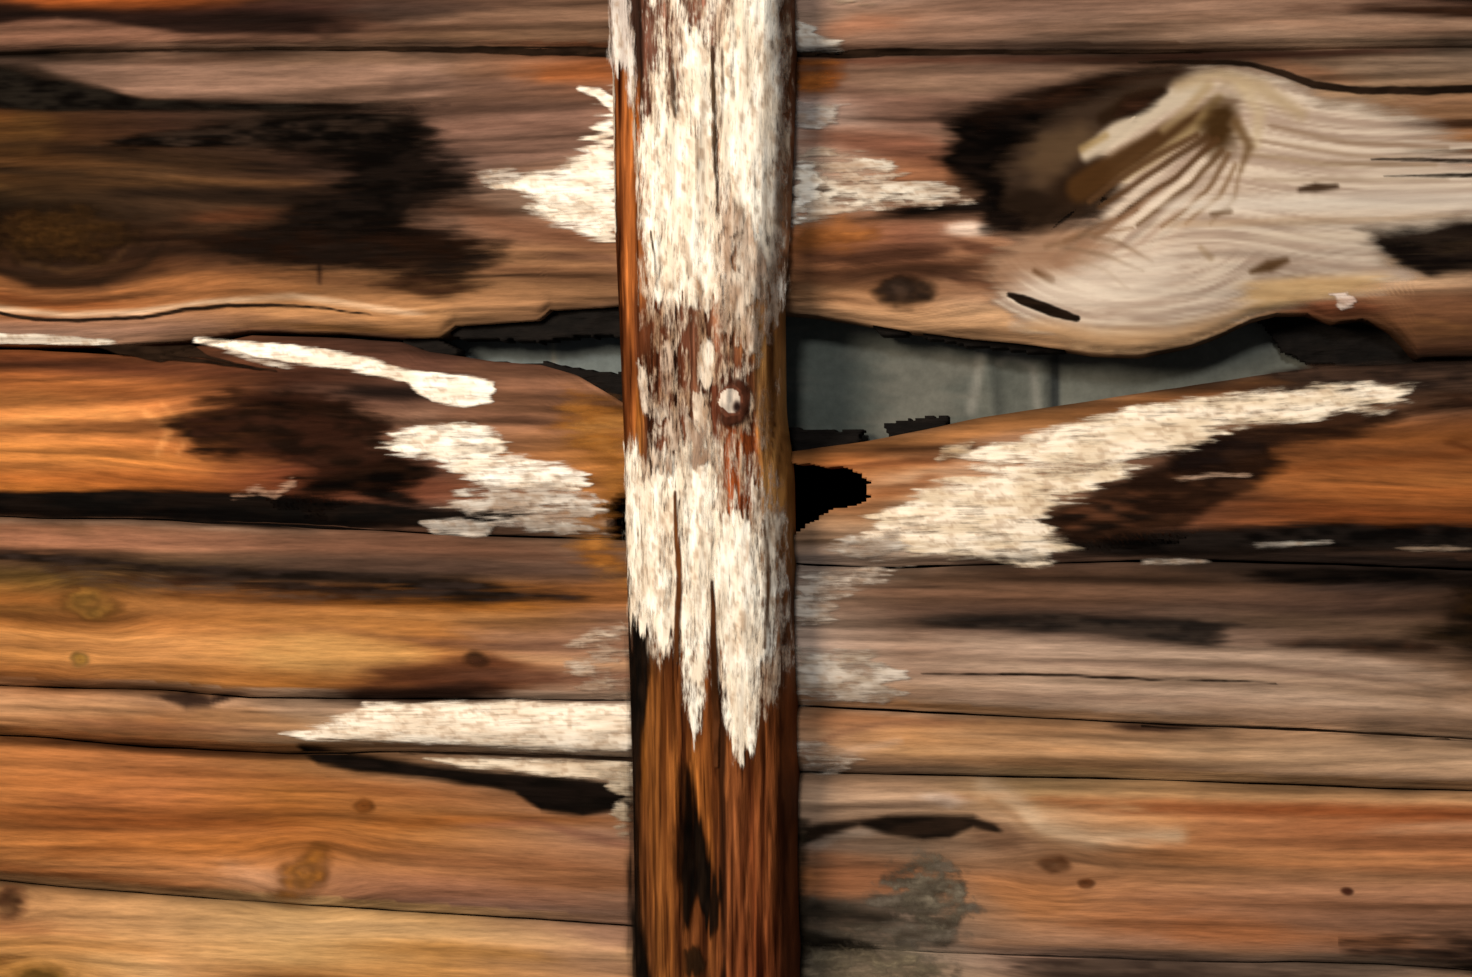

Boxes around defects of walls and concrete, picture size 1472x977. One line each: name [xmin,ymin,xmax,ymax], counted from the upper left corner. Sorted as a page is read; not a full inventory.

water stain [0,69,502,295]
crack [1007,293,1080,322]
water stain [0,389,529,529]
water stain [1040,364,1472,555]
water stain [922,613,1235,645]
water stain [1249,569,1472,652]
water stain [298,616,650,977]
water stain [677,769,725,977]
water stain [798,815,1000,977]